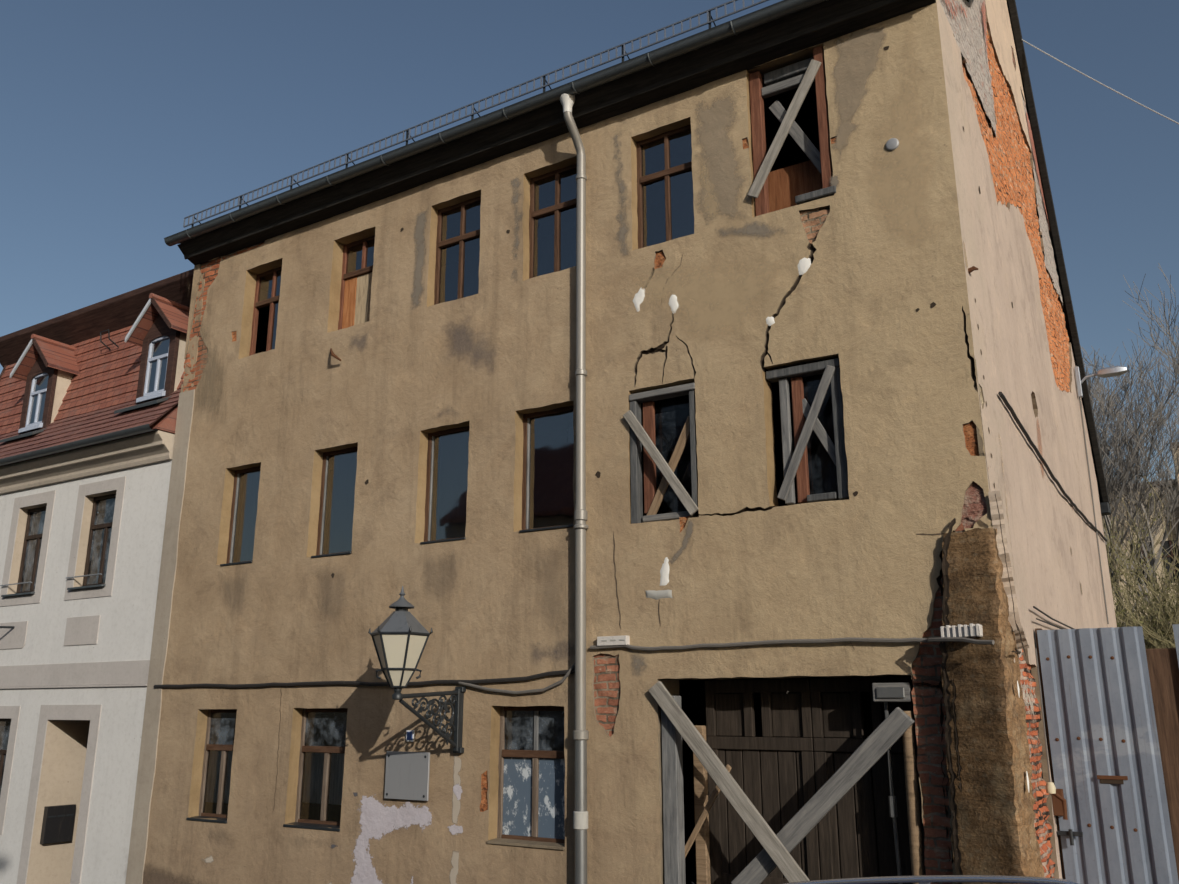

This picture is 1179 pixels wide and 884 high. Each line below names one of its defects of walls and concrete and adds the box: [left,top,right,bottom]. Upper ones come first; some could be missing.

spalling [800,207,830,245]
spalling [939,0,1070,392]
spalling [183,242,264,392]
crack [635,254,696,384]
crack [760,243,817,371]
crack [962,308,978,392]
crack [698,506,775,516]
spalling [594,654,621,737]
spalling [911,572,953,884]
spalling [955,482,1055,878]